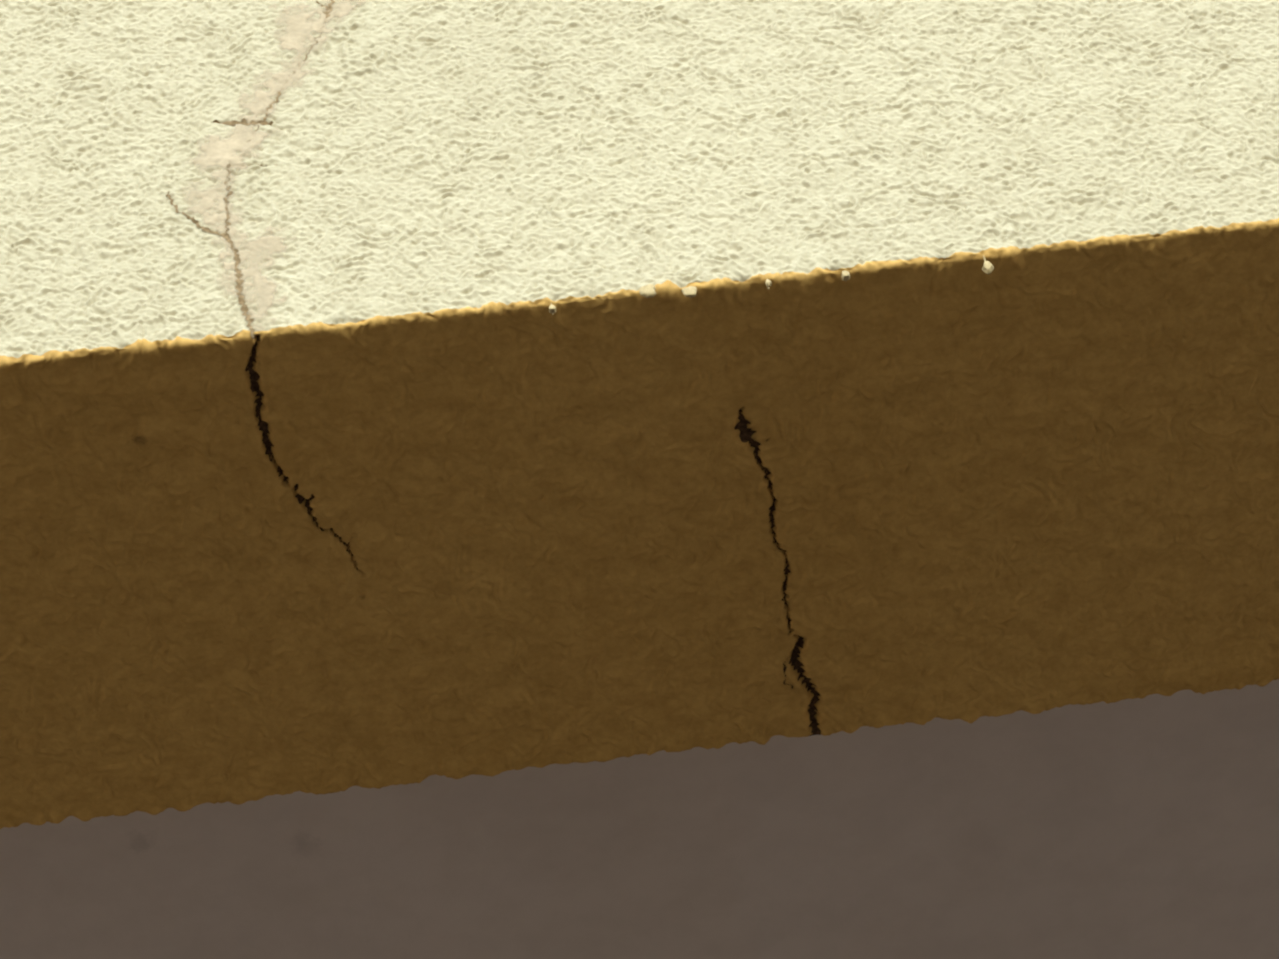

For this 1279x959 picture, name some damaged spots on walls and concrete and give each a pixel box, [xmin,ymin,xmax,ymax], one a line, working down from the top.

crack [166,0,358,570]
crack [734,409,821,736]